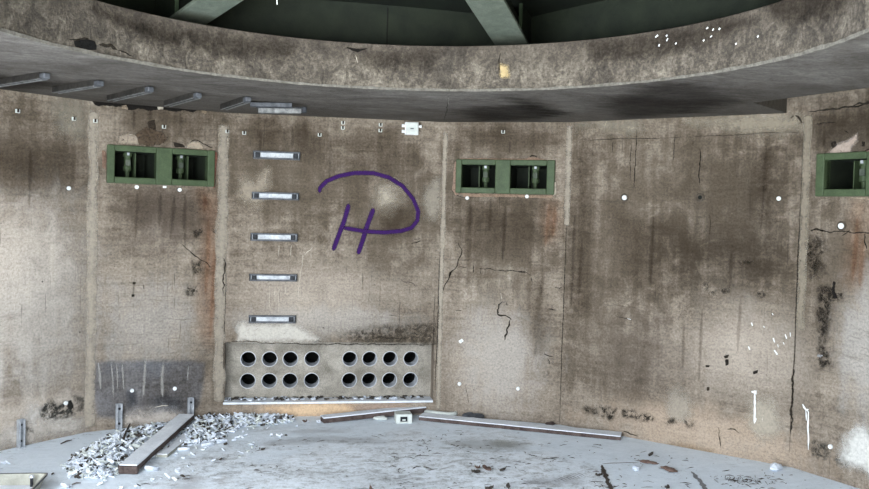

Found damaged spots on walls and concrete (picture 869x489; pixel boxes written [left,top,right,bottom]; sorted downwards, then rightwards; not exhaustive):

spalling [69,37,133,57]
crack [183,244,532,384]
crack [544,225,567,420]
crack [597,101,869,433]
damp [127,366,176,424]